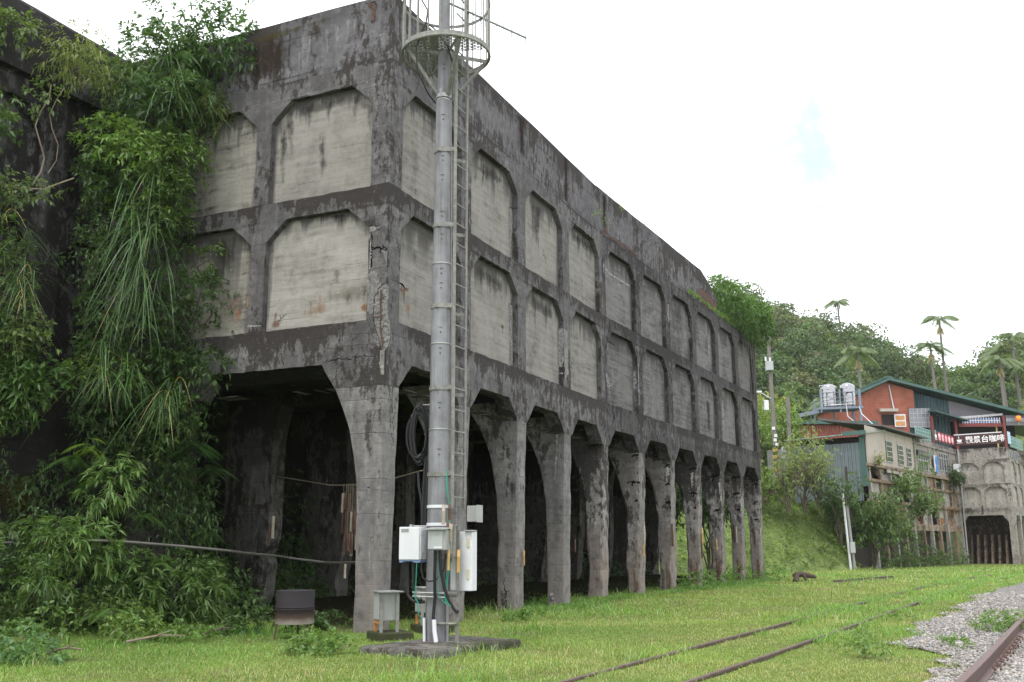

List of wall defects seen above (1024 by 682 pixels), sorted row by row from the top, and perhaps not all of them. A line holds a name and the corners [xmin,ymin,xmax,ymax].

crack [370,233,387,267]
spalling [367,225,390,375]